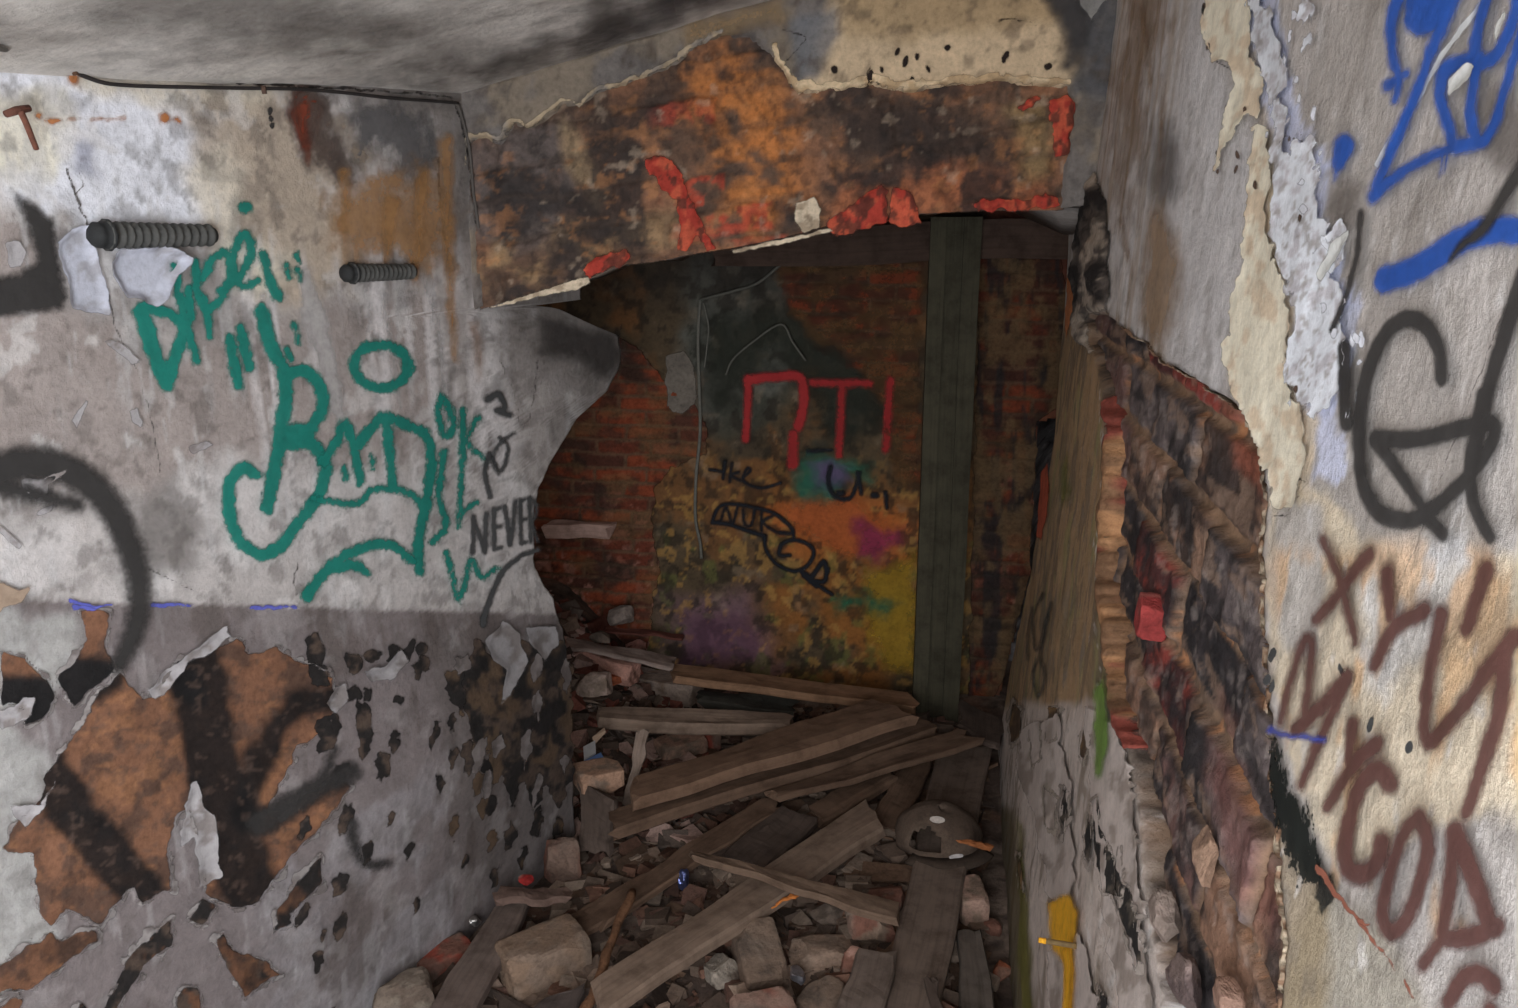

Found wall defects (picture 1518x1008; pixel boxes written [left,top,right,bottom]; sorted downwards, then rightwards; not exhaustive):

spalling [1494,12,1505,41]
water stain [289,84,437,186]
peeling [58,225,193,315]
water stain [301,269,345,438]
spalling [464,0,1365,1008]
peeling [0,583,30,612]
peeling [0,607,575,1008]